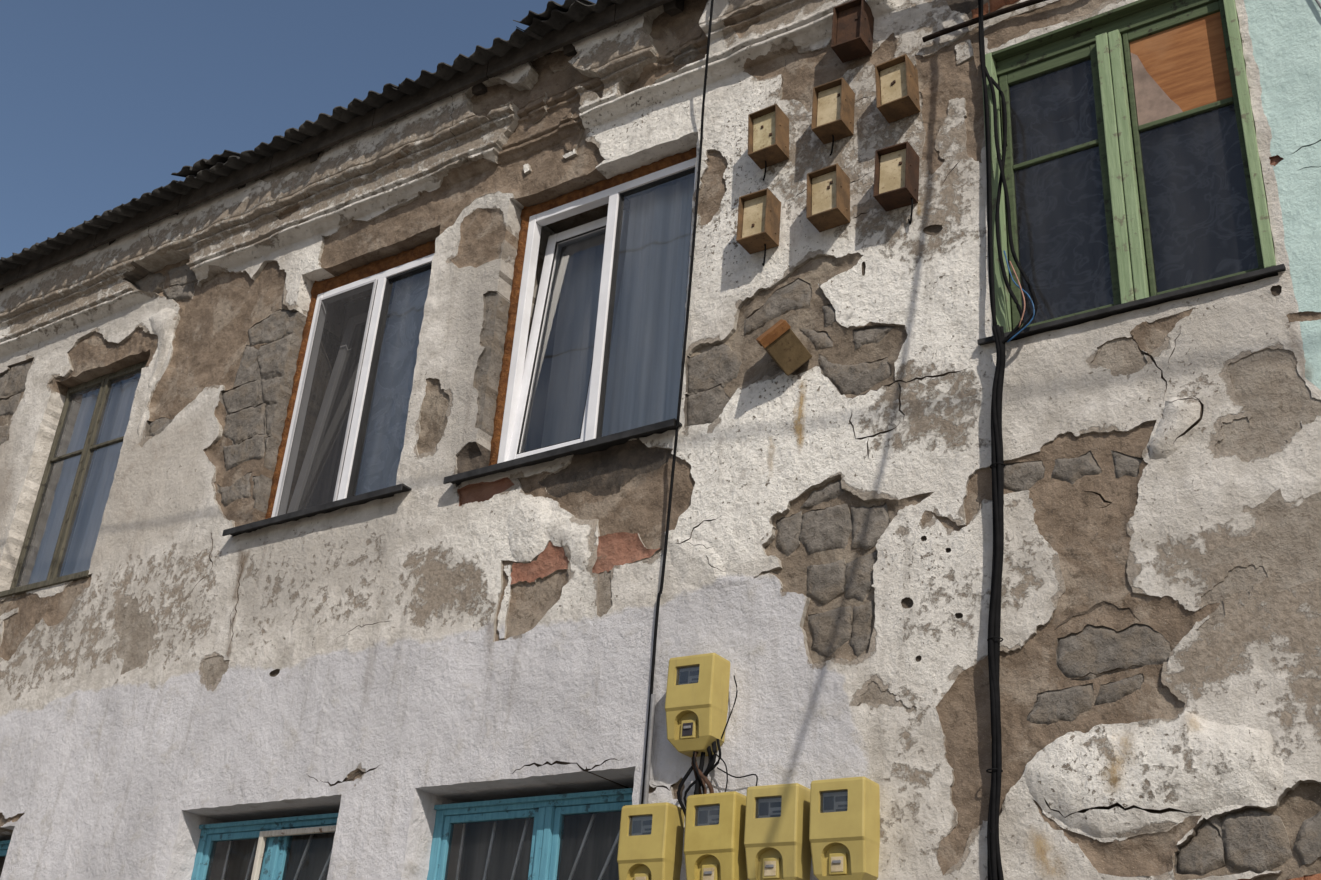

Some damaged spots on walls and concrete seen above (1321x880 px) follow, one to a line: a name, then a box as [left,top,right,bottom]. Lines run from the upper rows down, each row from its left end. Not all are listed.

peeling [694,149,728,225]
spalling [0,357,34,445]
spalling [48,249,307,537]
peeling [318,0,708,617]
spalling [684,252,908,427]
peeling [1091,308,1193,377]
crack [1129,329,1204,444]
peeling [1215,348,1321,459]
peeling [0,574,92,662]
peeling [493,540,569,642]
peeling [754,420,1321,880]
crack [512,758,676,791]